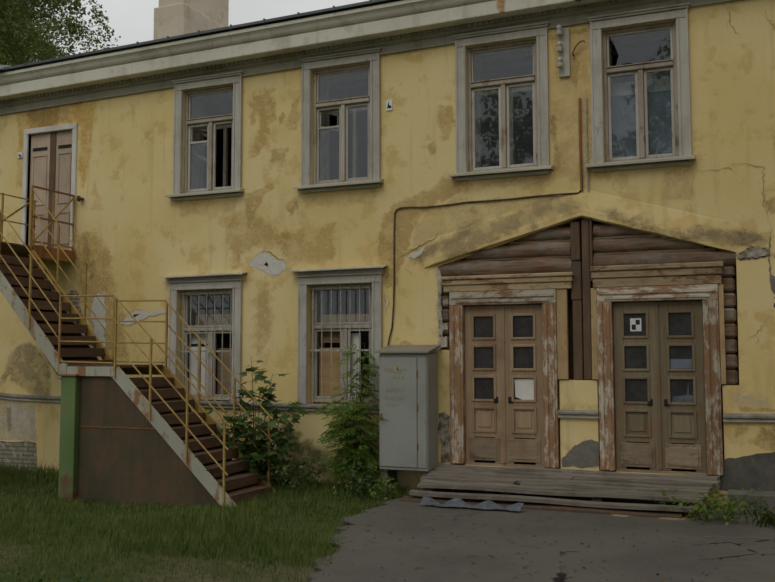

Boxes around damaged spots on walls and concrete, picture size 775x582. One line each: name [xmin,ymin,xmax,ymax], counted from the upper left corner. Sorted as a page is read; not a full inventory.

flaking render [736,244,770,260]
flaking render [249,251,287,275]
flaking render [120,309,166,325]